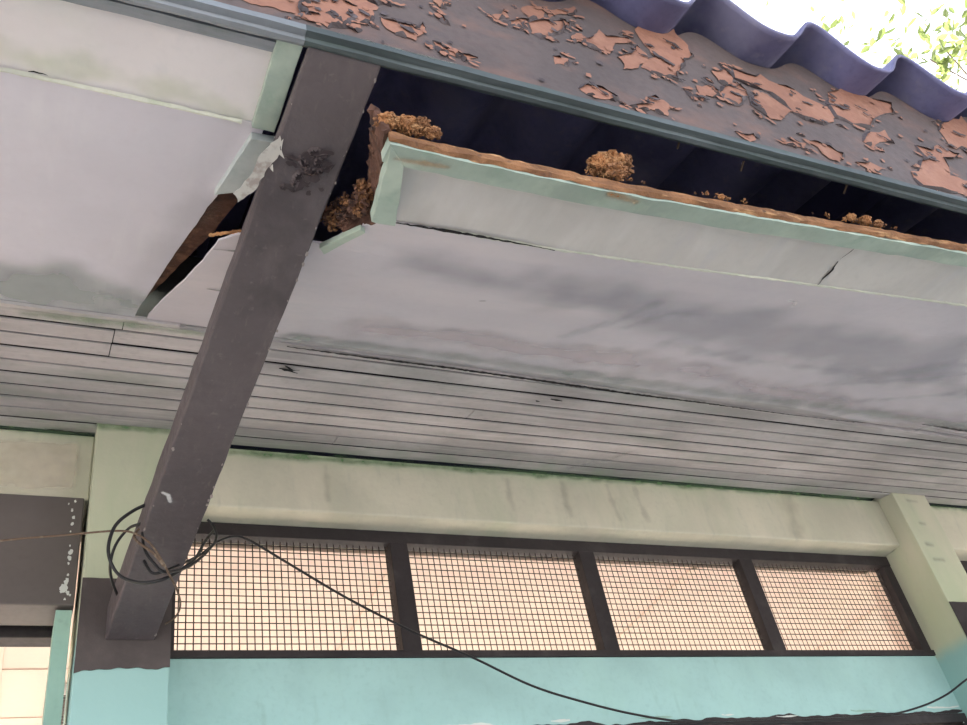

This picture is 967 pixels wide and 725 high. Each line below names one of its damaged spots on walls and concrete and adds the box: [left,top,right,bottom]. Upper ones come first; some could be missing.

peeling [244,0,480,66]
peeling [478,1,903,174]
peeling [906,116,967,198]
spalling [209,229,241,237]
peeling [59,545,73,600]